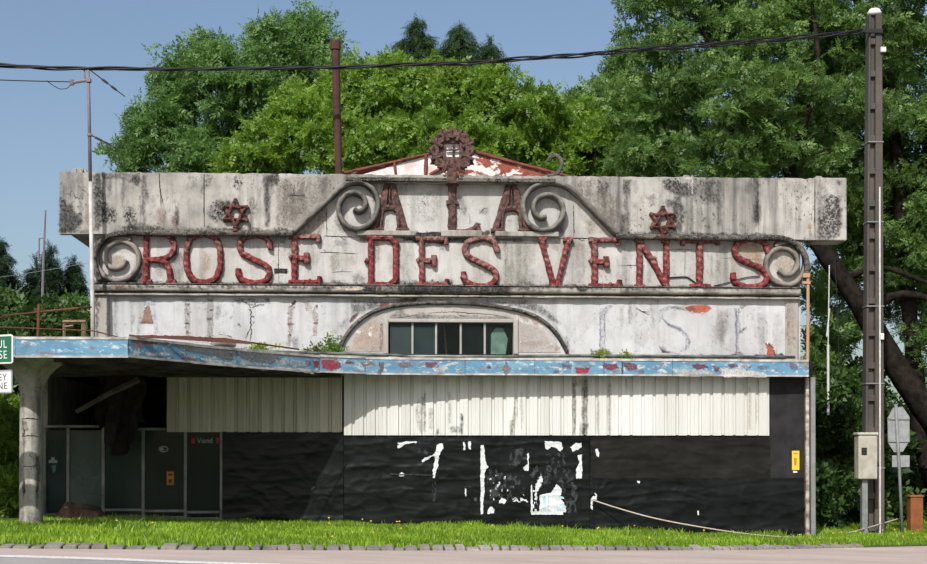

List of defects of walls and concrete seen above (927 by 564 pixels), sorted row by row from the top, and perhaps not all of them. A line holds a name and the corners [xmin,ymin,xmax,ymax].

water stain [60,200,82,233]
water stain [93,175,179,239]
water stain [193,174,278,231]
water stain [664,178,720,235]
mould [818,195,842,238]
water stain [94,228,554,324]
crack [235,300,258,339]
peeling [660,305,711,355]
peeling [673,363,767,378]